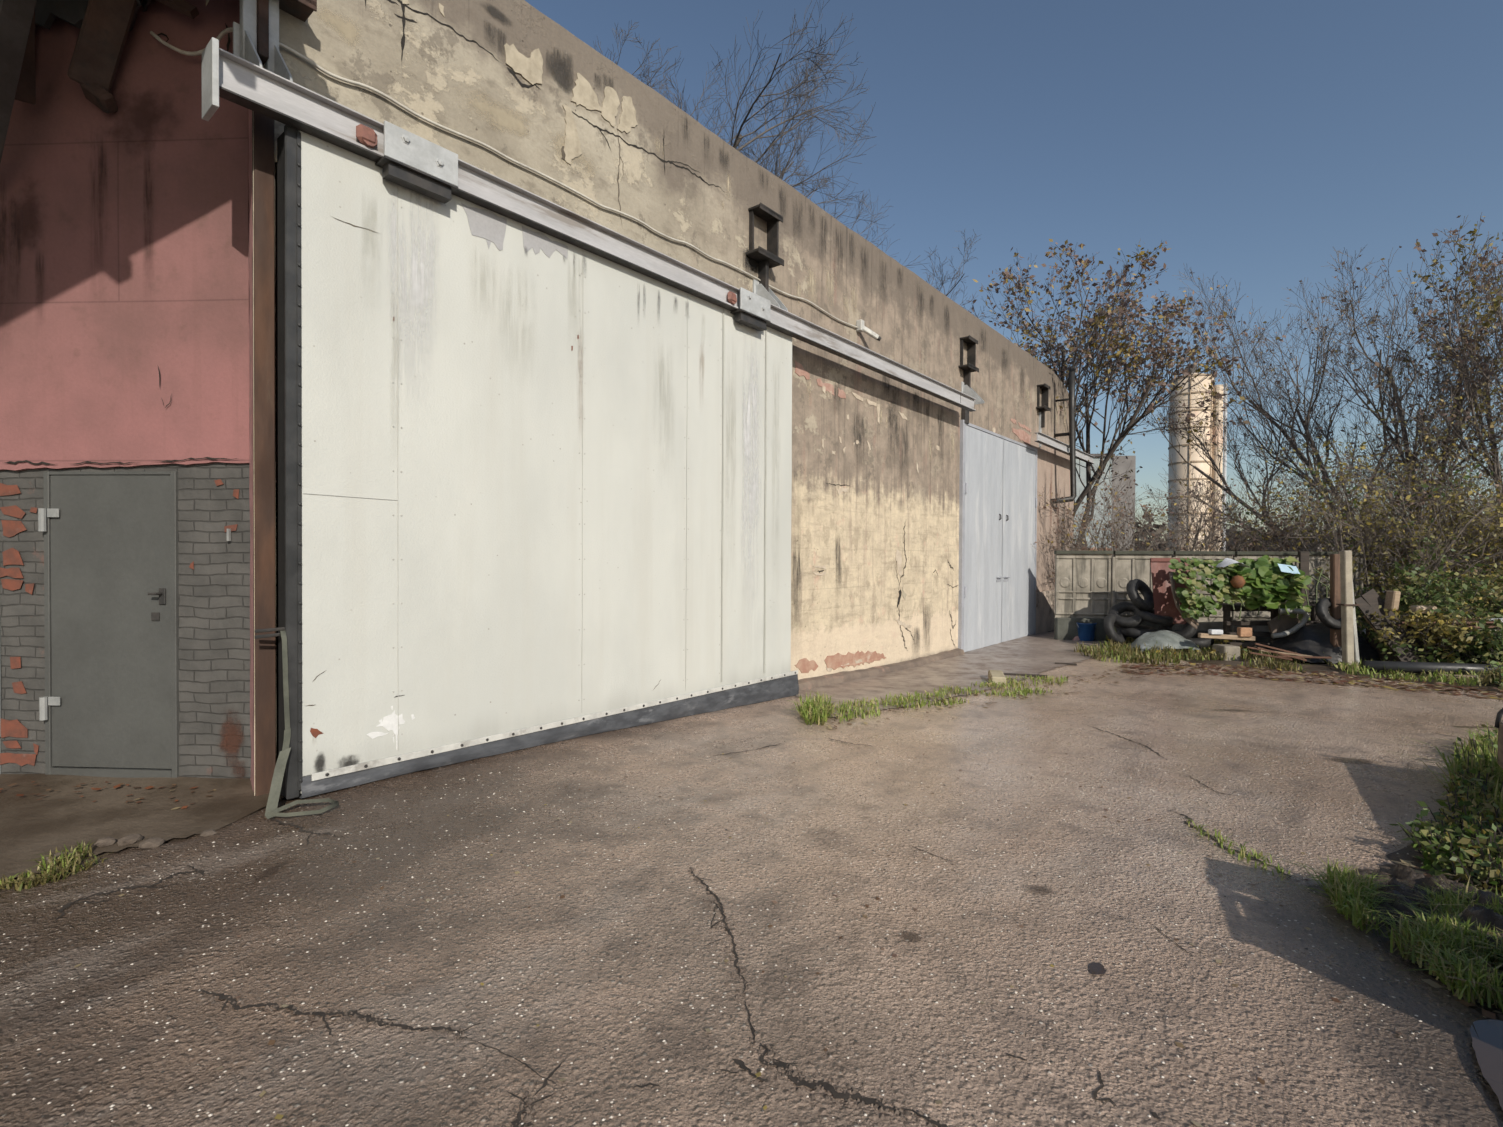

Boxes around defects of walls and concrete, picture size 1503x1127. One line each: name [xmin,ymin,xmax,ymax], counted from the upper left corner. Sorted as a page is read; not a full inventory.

crack [365,0,497,60]
spalling [504,43,543,89]
spalling [561,73,638,165]
crack [572,111,724,222]
peeling [0,483,38,595]
crack [896,525,958,651]
peeling [10,657,26,694]
spalling [795,651,886,673]
peeling [0,718,39,766]